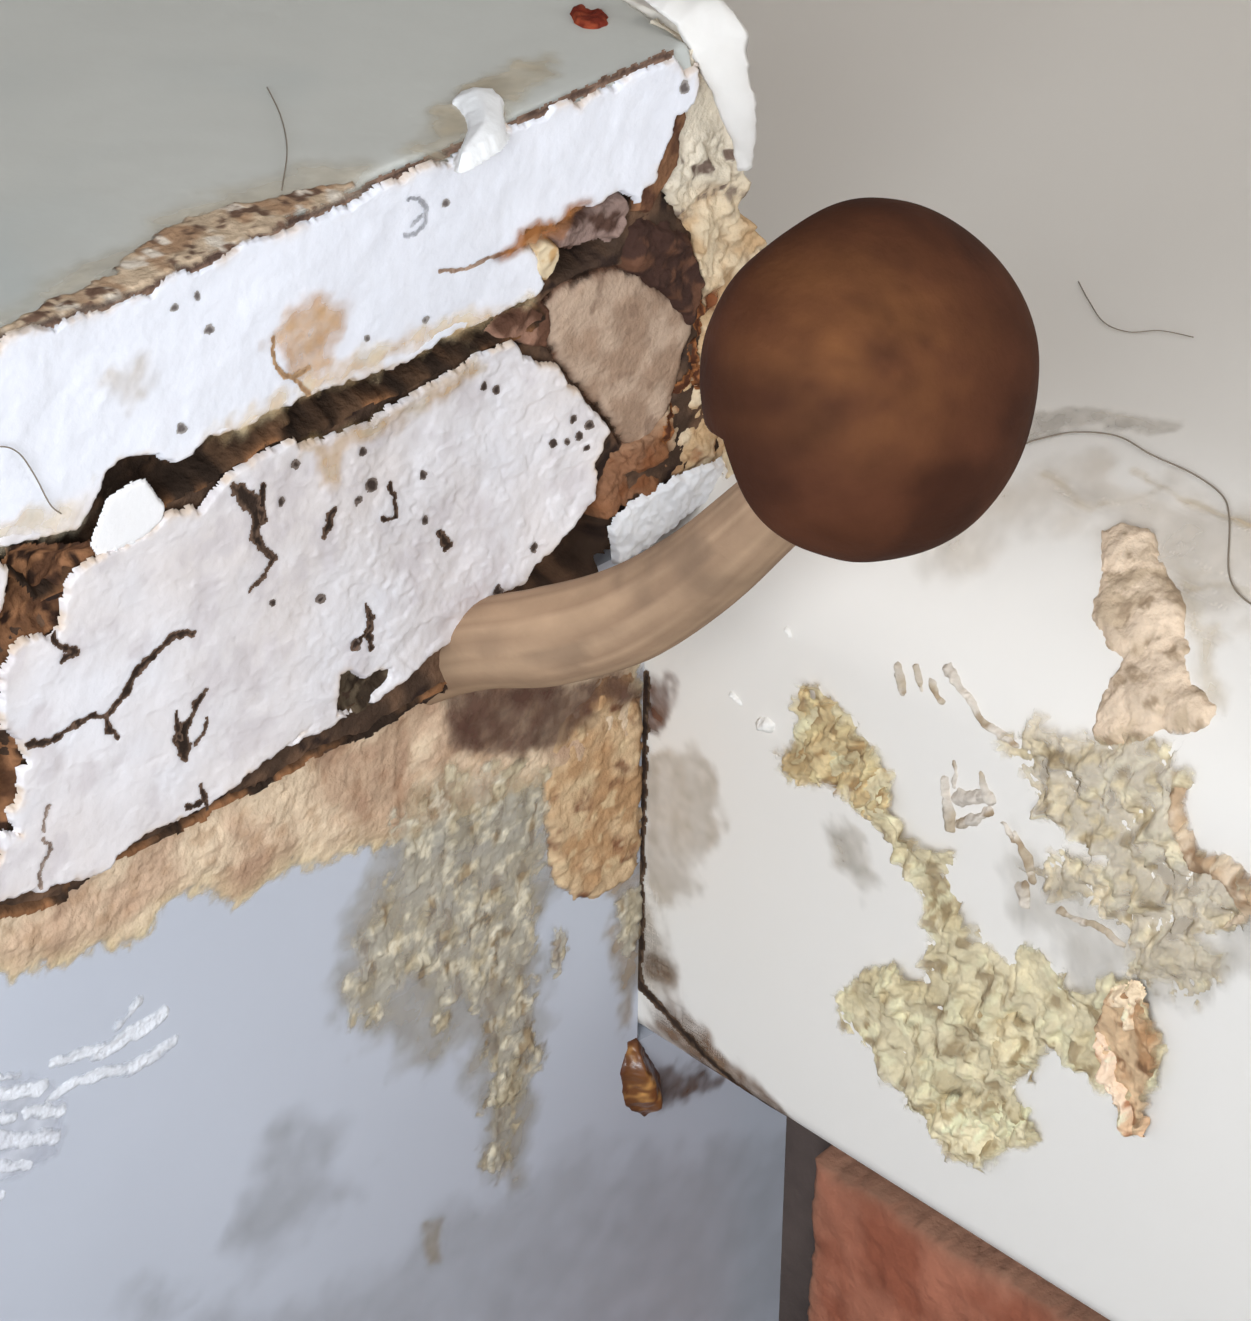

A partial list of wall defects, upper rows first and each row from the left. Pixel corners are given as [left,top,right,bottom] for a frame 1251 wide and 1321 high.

peeling [451,87,511,173]
spalling [484,0,767,520]
peeling [90,478,165,555]
crack [0,299,546,693]
crack [0,629,197,919]
crack [116,682,447,860]
spalling [337,669,388,715]
peeling [0,696,589,1134]
water stain [346,785,549,1006]
flaking render [781,662,1251,1172]
water stain [0,996,178,1201]
water stain [485,1022,530,1161]